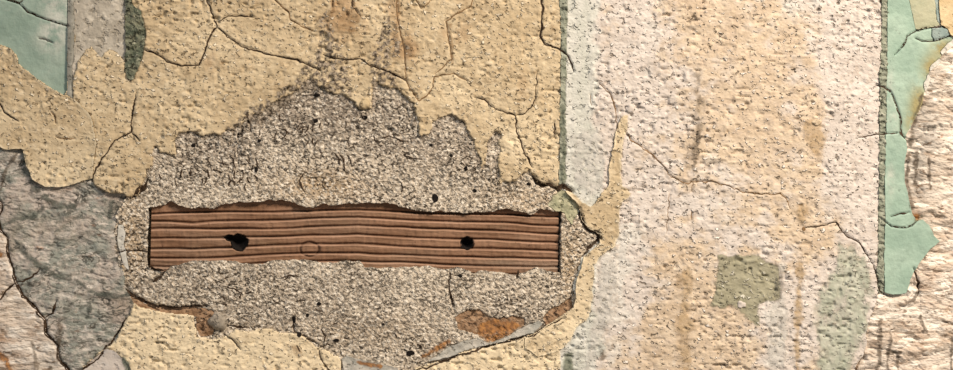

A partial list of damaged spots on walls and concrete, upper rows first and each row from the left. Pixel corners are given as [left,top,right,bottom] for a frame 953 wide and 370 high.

crack [8,0,67,43]
crack [92,92,140,180]
spalling [0,0,631,370]
crack [145,0,602,256]
corrosion [479,320,519,341]
crack [590,83,790,230]
crack [806,222,885,295]
spalling [817,0,953,370]